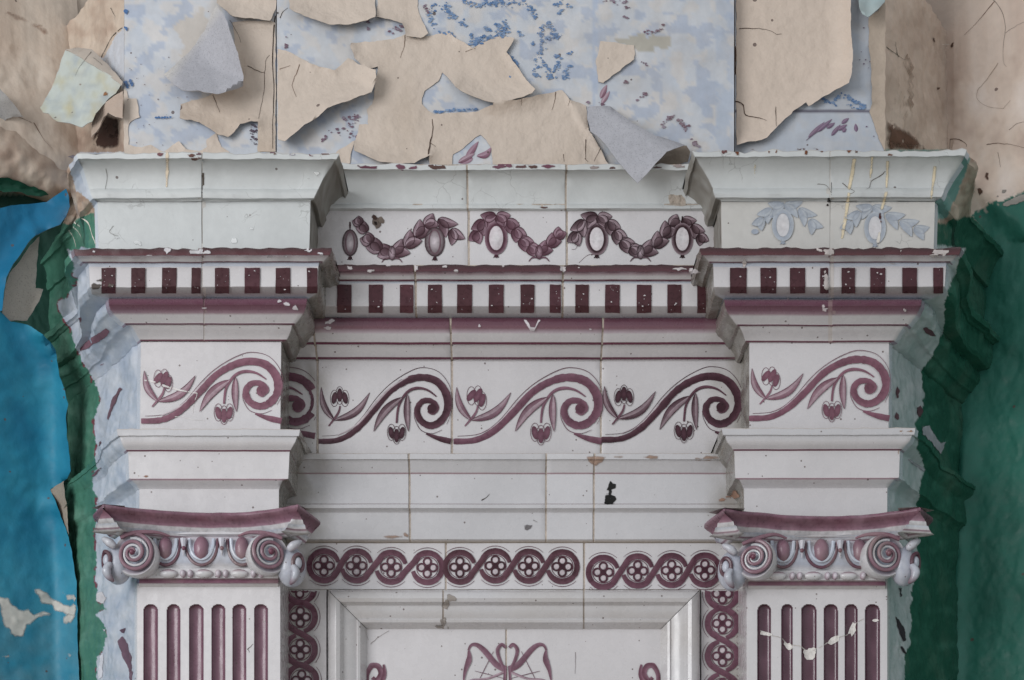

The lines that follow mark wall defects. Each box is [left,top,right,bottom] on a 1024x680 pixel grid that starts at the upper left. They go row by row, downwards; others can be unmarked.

peeling [123,0,615,171]
peeling [596,41,635,83]
peeling [736,0,853,145]
crack [949,0,1024,162]
peeling [997,190,1024,206]
peeling [80,329,109,351]
peeling [107,388,122,419]
peeling [0,189,79,680]
peeling [917,406,945,454]
spalling [604,481,616,504]
peeling [117,628,133,680]
peeling [896,617,907,654]